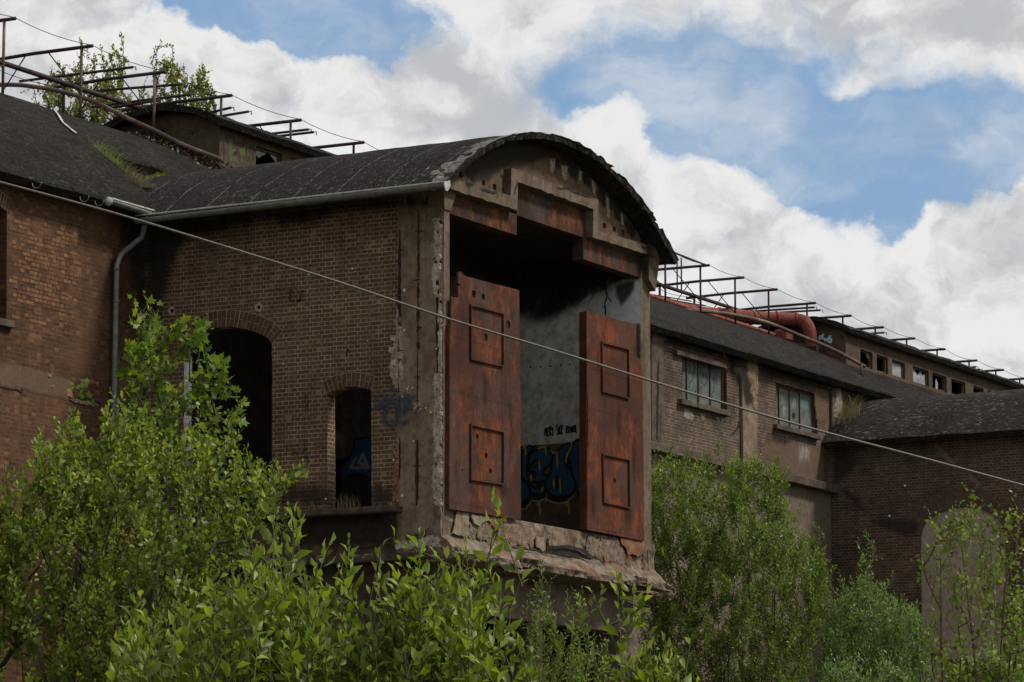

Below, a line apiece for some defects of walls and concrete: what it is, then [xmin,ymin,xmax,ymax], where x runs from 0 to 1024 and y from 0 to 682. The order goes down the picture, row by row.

spalling [388,210,646,565]